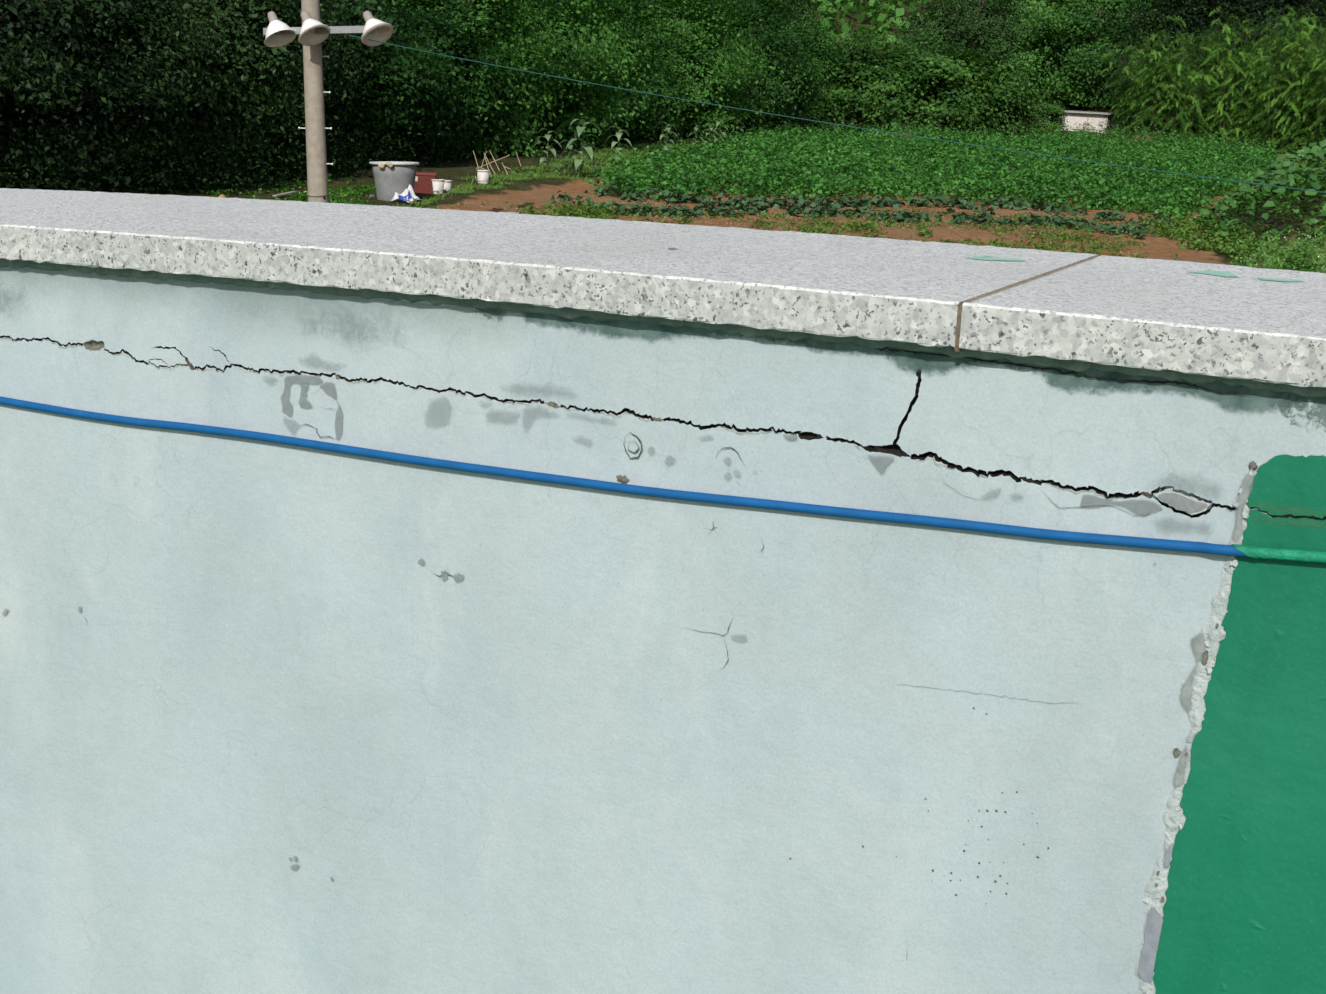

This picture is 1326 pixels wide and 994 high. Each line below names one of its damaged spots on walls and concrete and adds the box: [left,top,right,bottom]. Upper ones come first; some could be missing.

crack [0,335,1326,521]
peeling [1080,491,1213,515]
peeling [1135,460,1268,994]